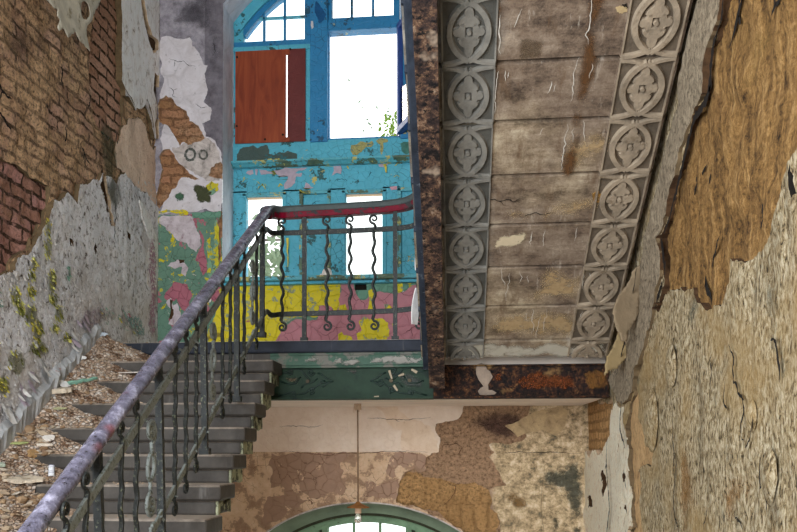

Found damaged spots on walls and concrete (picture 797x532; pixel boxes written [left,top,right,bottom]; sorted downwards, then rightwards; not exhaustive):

crack [0,84,12,134]
peeling [237,145,317,195]
flaking render [0,0,223,424]
flaking render [583,0,797,532]
peeling [178,283,420,353]
crack [770,337,780,379]
leakage [479,414,519,436]
crack [708,346,767,510]
flaking render [366,406,530,532]
leakage [509,494,526,507]
mould [545,464,582,516]
crack [605,403,626,532]